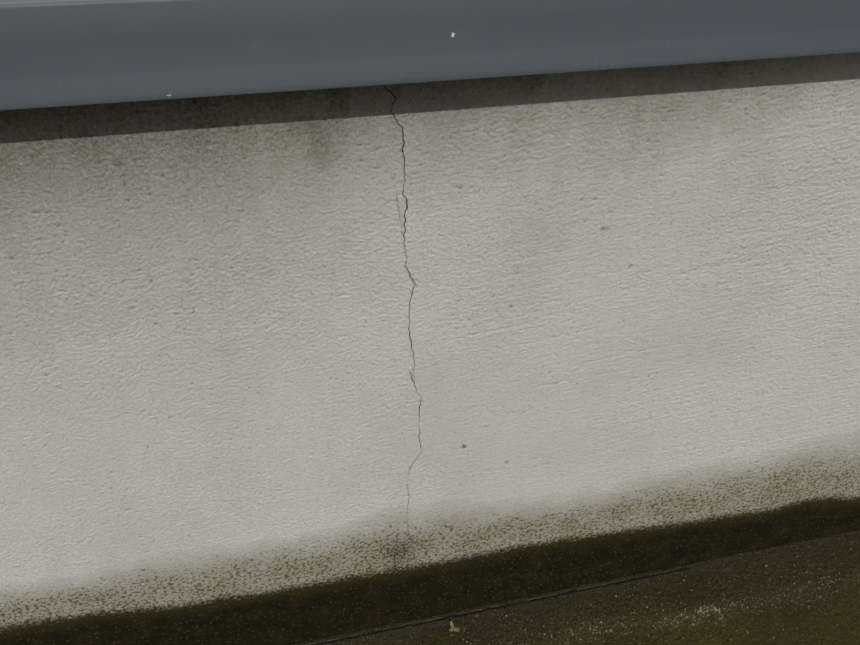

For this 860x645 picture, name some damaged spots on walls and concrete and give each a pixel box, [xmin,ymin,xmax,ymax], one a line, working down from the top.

crack [384,85,424,568]
leakage [0,453,860,645]